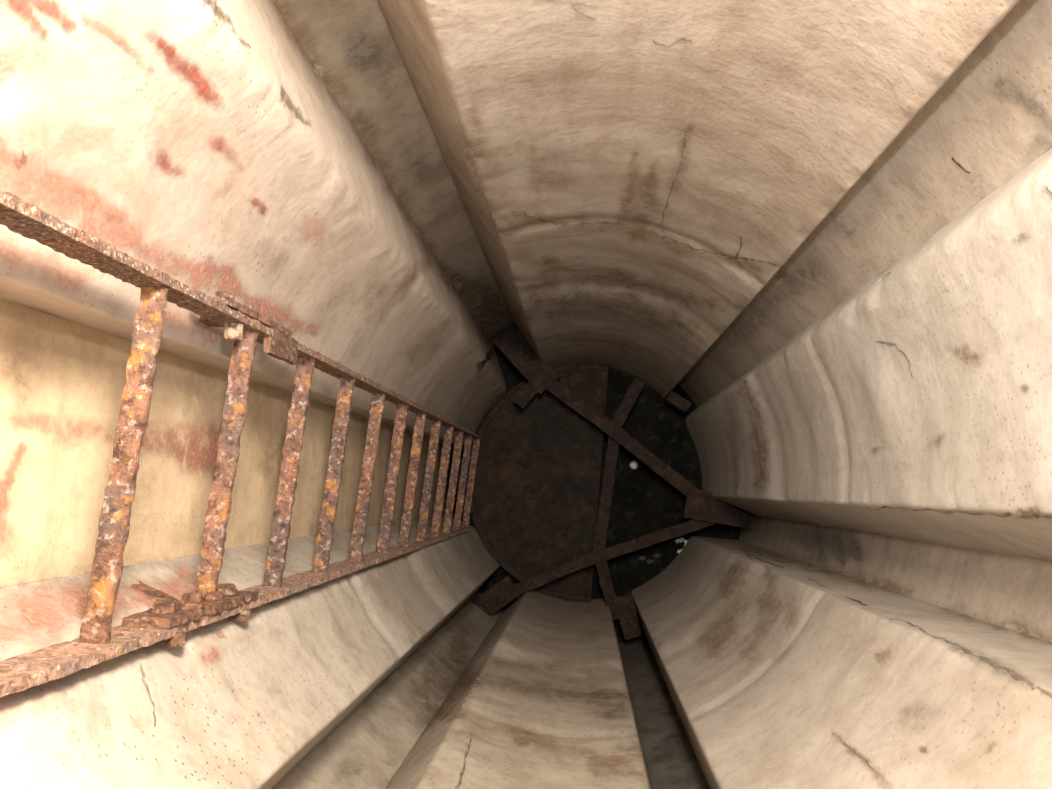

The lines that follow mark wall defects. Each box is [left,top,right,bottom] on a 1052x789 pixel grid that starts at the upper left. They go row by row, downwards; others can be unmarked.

rust [11,0,136,53]
rust [154,36,219,100]
crack [524,187,782,277]
rust [139,246,317,335]
rust [160,427,218,469]
rust [0,444,25,527]
rust [0,588,89,640]
rust [115,567,195,608]
spalling [897,619,1050,697]